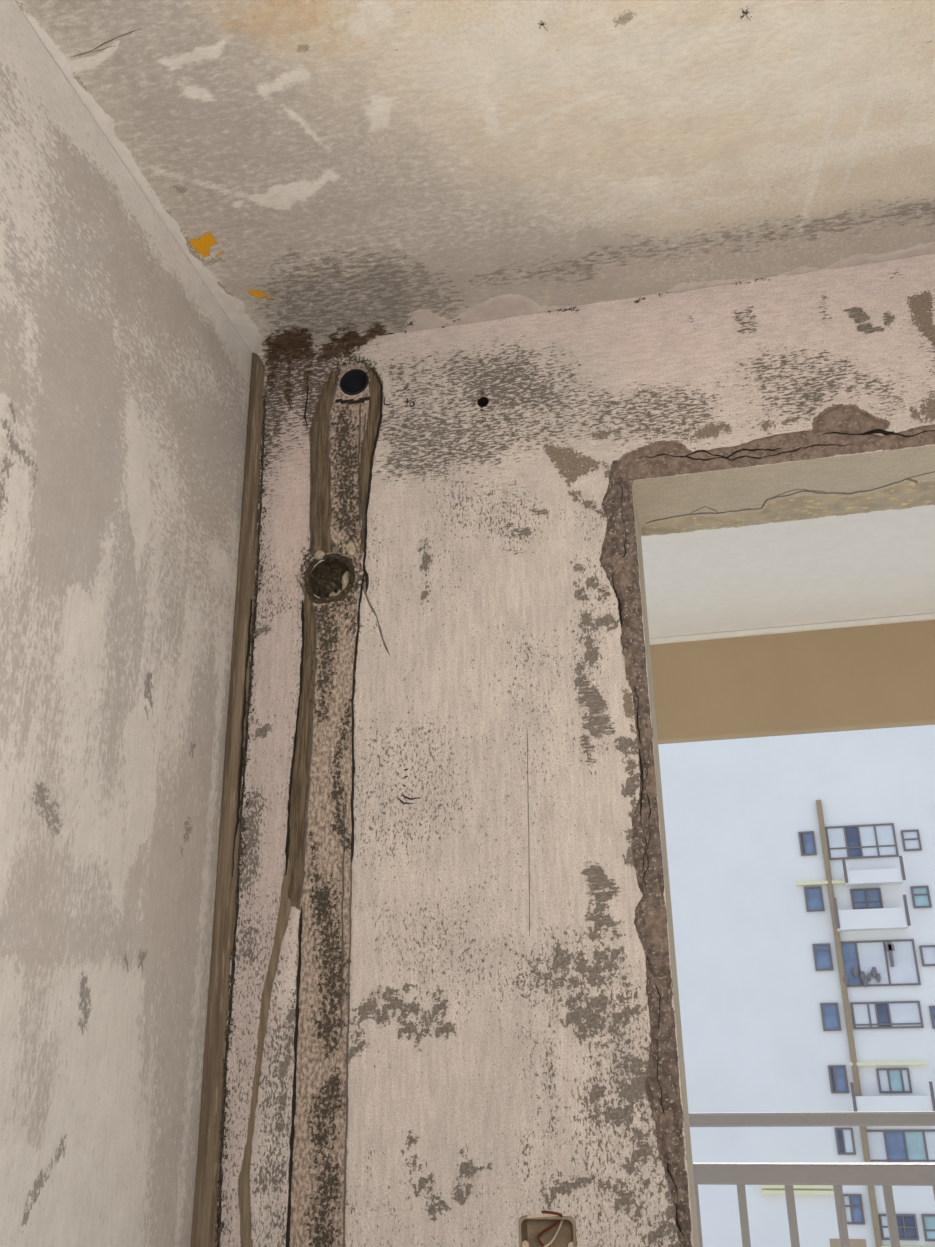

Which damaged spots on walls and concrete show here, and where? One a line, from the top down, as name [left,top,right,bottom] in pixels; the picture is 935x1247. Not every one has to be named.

leakage [262,323,394,409]